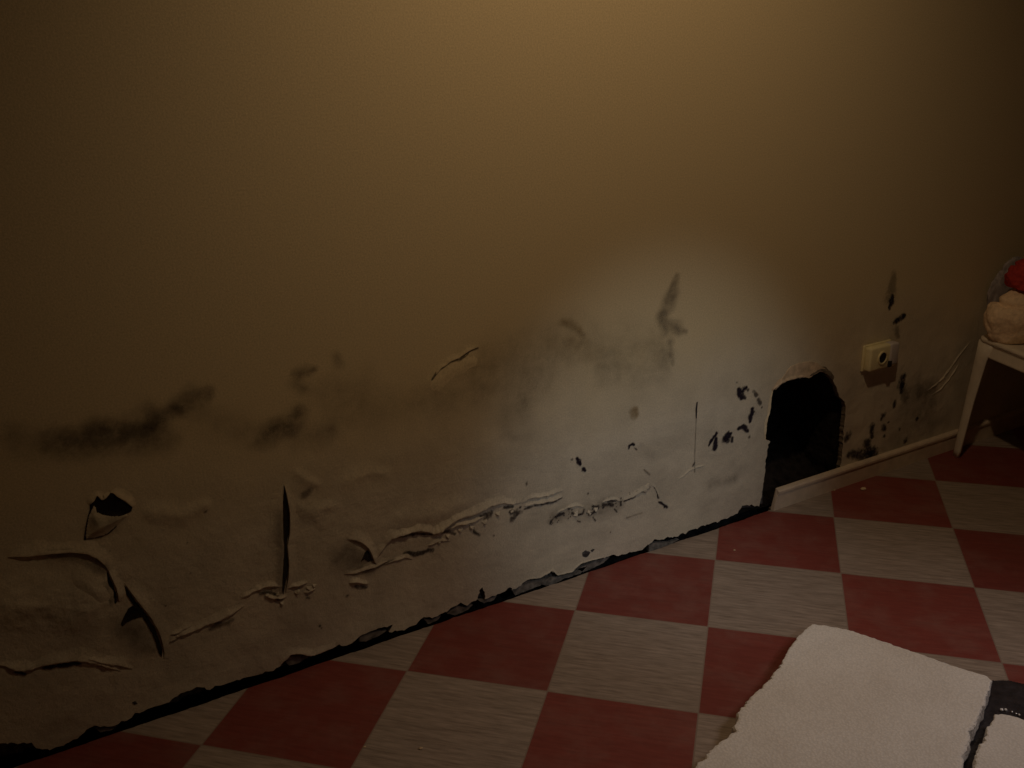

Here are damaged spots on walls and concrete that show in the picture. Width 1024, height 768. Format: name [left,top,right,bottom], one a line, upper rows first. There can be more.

leakage [844,374,907,460]
crack [267,483,300,595]
flaking render [0,362,834,768]